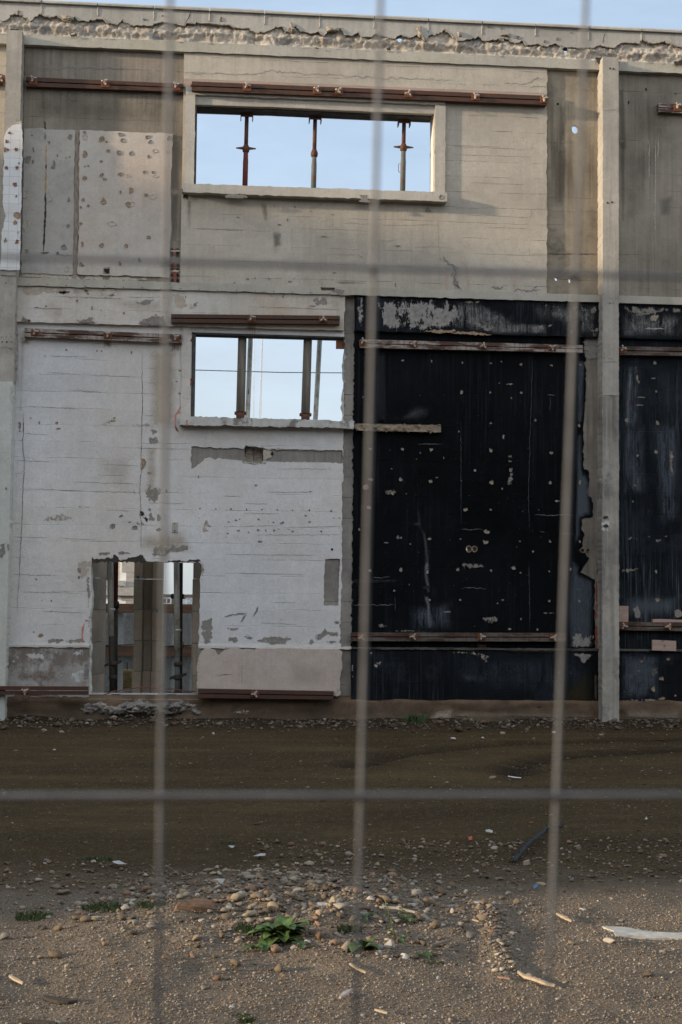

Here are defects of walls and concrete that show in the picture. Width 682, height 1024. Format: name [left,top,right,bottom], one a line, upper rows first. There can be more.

spalling [0,11,327,49]
spalling [340,26,682,66]
crack [413,224,461,290]
peeling [378,299,598,366]
crack [12,356,184,613]
spalling [77,544,200,626]
peeling [201,619,212,644]
peeling [227,627,291,645]
peeling [309,621,339,645]